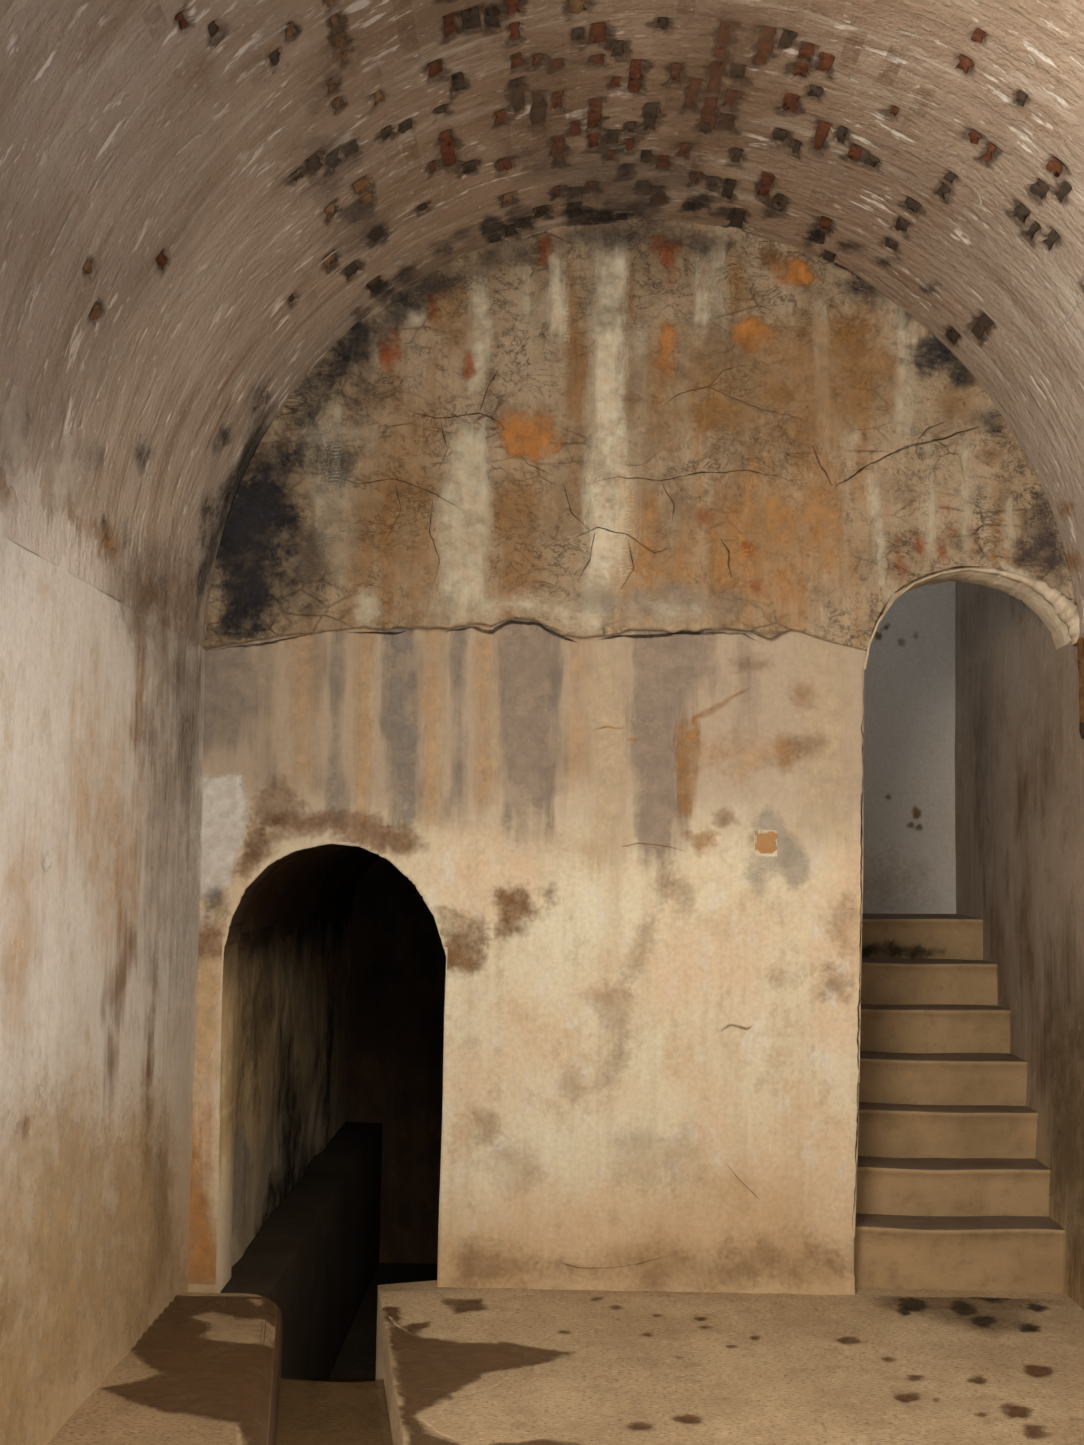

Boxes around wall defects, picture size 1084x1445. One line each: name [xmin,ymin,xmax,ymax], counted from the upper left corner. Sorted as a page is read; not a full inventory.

spalling [175,9,191,30]
spalling [89,301,104,323]
flaking render [203,0,1075,651]
water stain [123,253,449,802]
corrosion [501,415,556,460]
crack [416,372,780,590]
crack [667,368,978,486]
water stain [274,429,558,850]
crack [449,620,754,642]
crack [871,566,977,634]
water stain [0,1048,277,1445]
water stain [382,1306,569,1445]